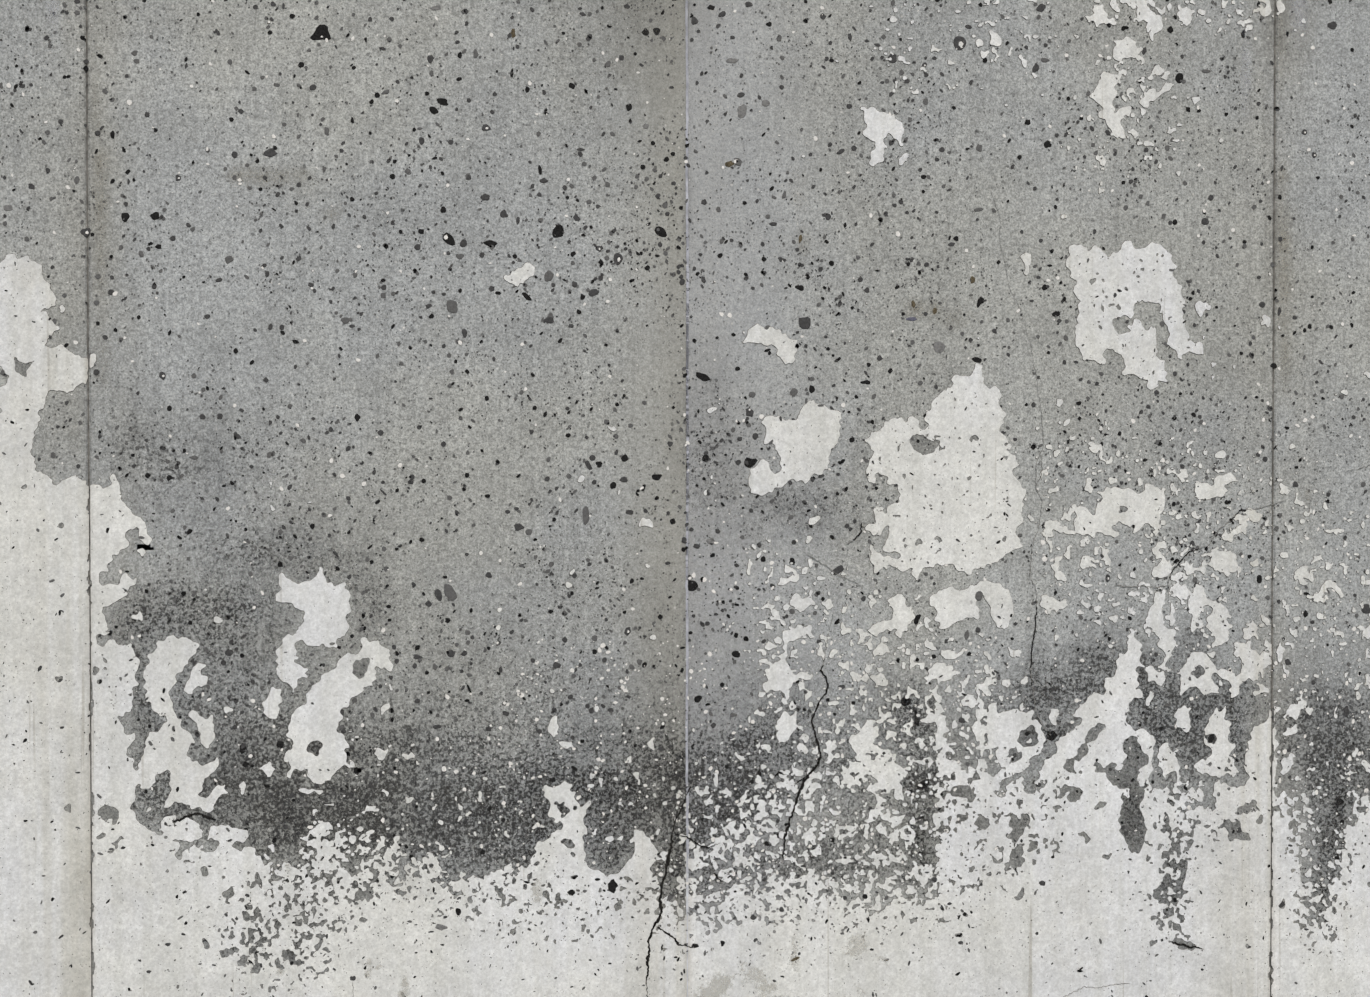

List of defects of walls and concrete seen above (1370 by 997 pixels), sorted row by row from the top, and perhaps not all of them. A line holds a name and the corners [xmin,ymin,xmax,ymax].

peeling [860,106,909,167]
peeling [871,0,1306,194]
peeling [0,240,1370,997]
crack [805,521,864,587]
crack [764,612,834,883]
crack [646,780,722,997]